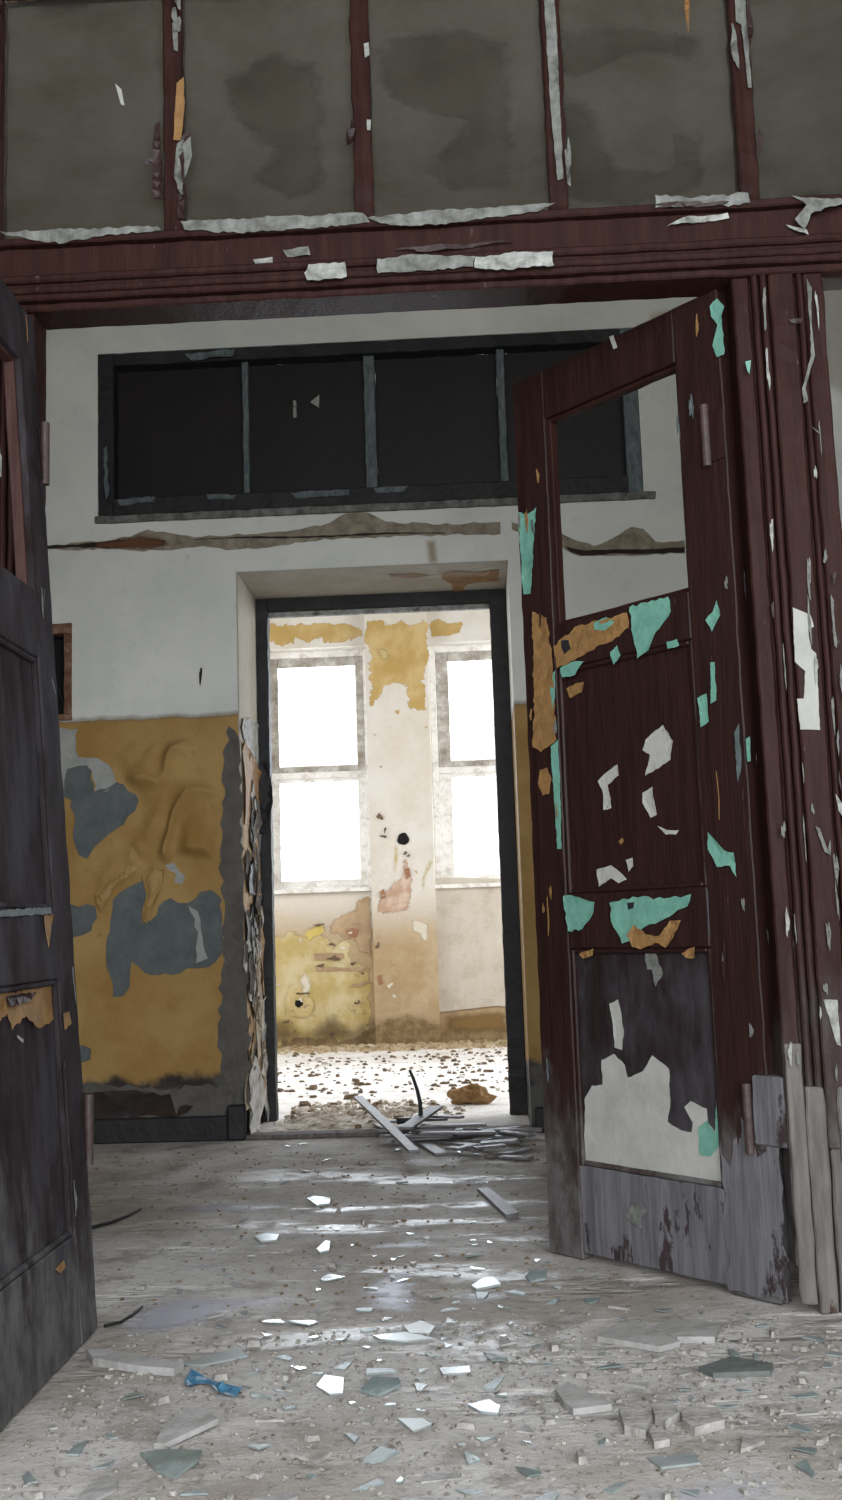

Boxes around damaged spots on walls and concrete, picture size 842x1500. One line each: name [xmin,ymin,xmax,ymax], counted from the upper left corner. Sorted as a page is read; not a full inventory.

peeling [389,569,500,592]
peeling [518,508,536,594]
peeling [269,619,463,728]
peeling [783,549,842,755]
peeling [529,597,679,849]
peeling [781,803,839,950]
peeling [0,907,53,947]
peeling [59,718,427,1135]
peeling [0,967,76,1043]
peeling [788,1042,800,1070]
peeling [819,983,841,1081]